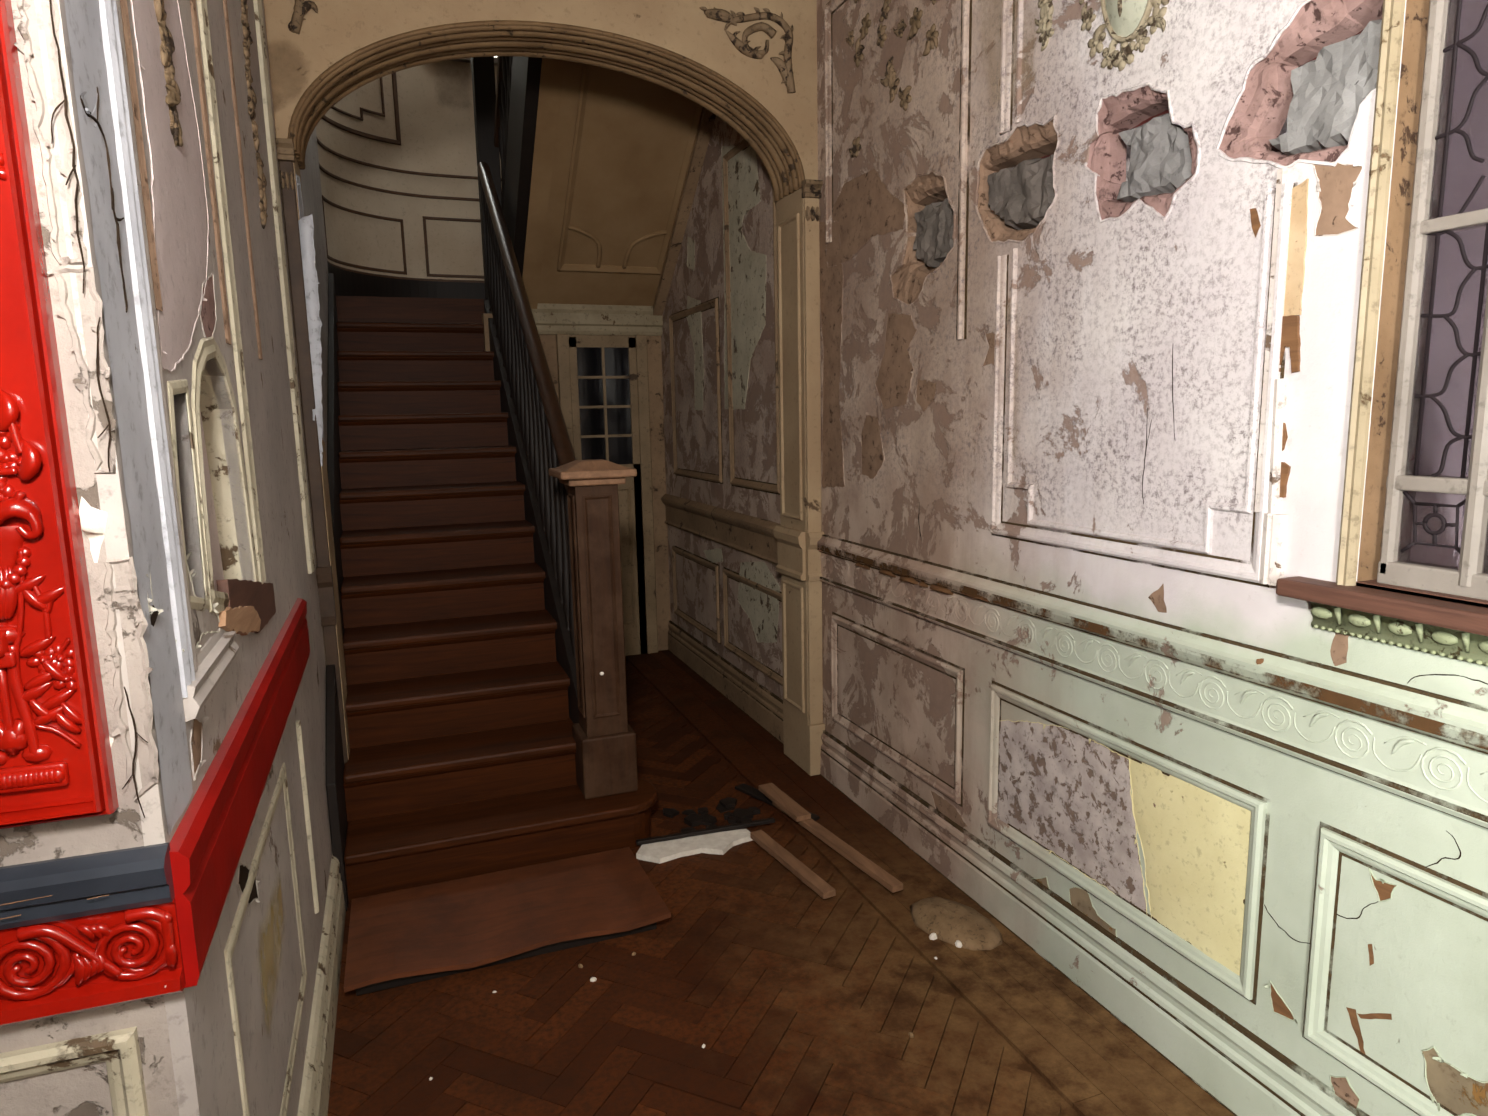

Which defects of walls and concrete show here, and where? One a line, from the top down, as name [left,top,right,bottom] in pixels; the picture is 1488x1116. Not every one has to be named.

crack [49,0,128,472]
spalling [976,114,1060,244]
spalling [1084,0,1383,238]
spalling [819,169,956,488]
peeling [982,332,995,367]
flaking render [79,496,164,802]
peeling [1148,584,1167,613]
peeling [1330,633,1349,666]
crack [122,687,148,818]
peeling [997,720,1147,937]
peeling [1421,1046,1488,1116]